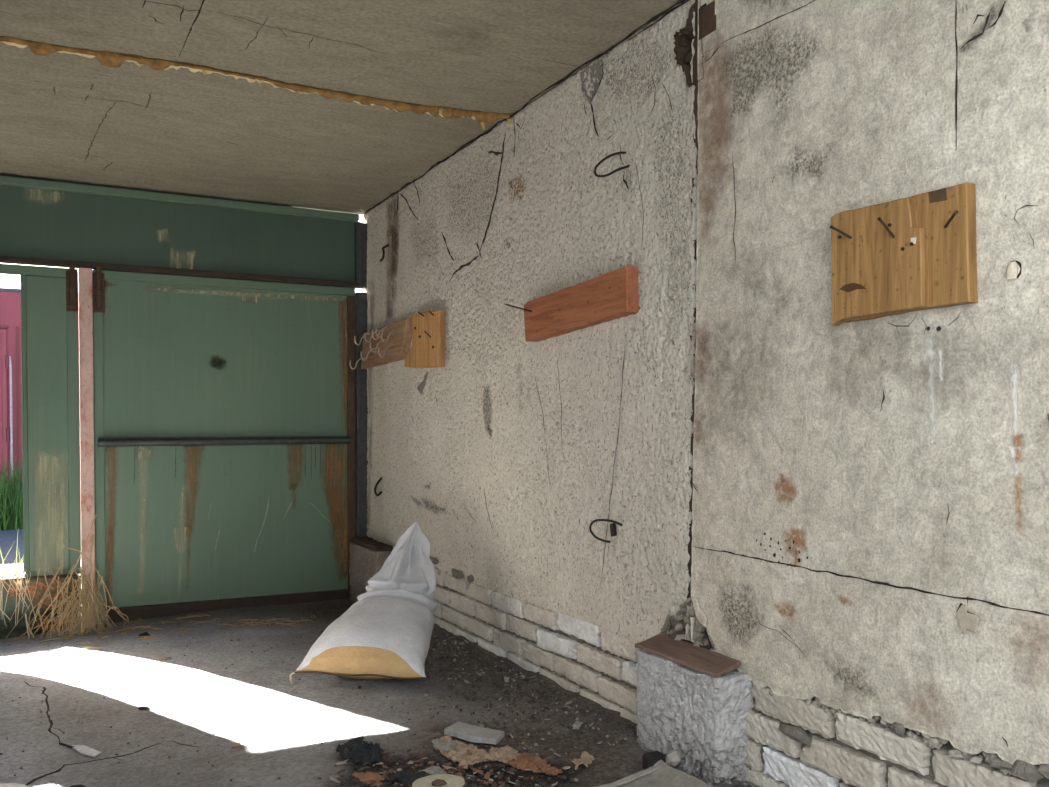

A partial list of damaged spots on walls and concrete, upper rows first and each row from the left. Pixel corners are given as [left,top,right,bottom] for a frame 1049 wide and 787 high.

crack [142,0,389,56]
spalling [673,0,716,88]
crack [85,84,152,170]
crack [365,0,1049,616]
leakage [925,334,943,437]
leakage [1009,362,1022,473]
rust [788,530,804,561]
spalling [659,596,716,651]
crack [24,680,197,786]
spalling [798,697,1012,776]